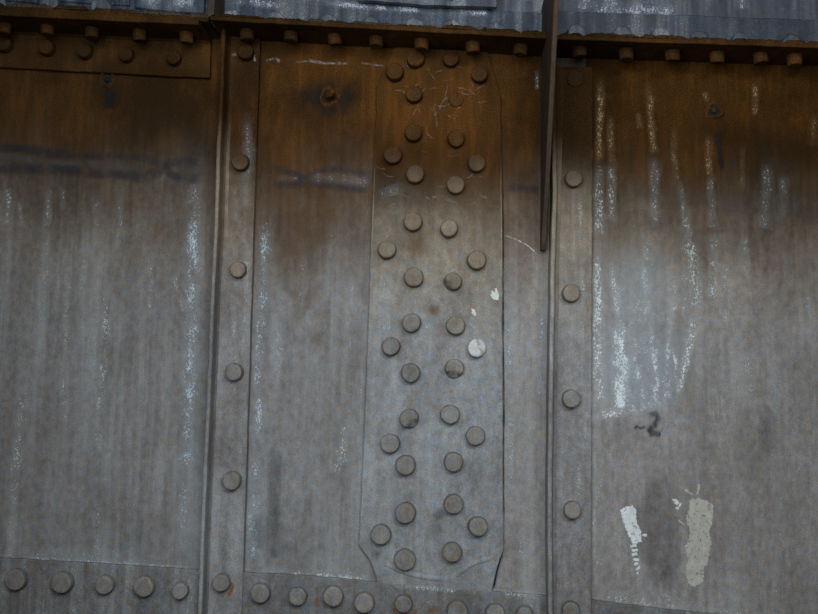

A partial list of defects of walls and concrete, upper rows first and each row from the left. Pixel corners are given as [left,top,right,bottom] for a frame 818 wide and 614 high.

corrosion [0,36,221,186]
corrosion [230,40,550,220]
corrosion [562,59,818,227]
water stain [180,212,202,464]
water stain [581,263,696,417]
peeling [620,505,647,575]
peeling [672,484,714,587]